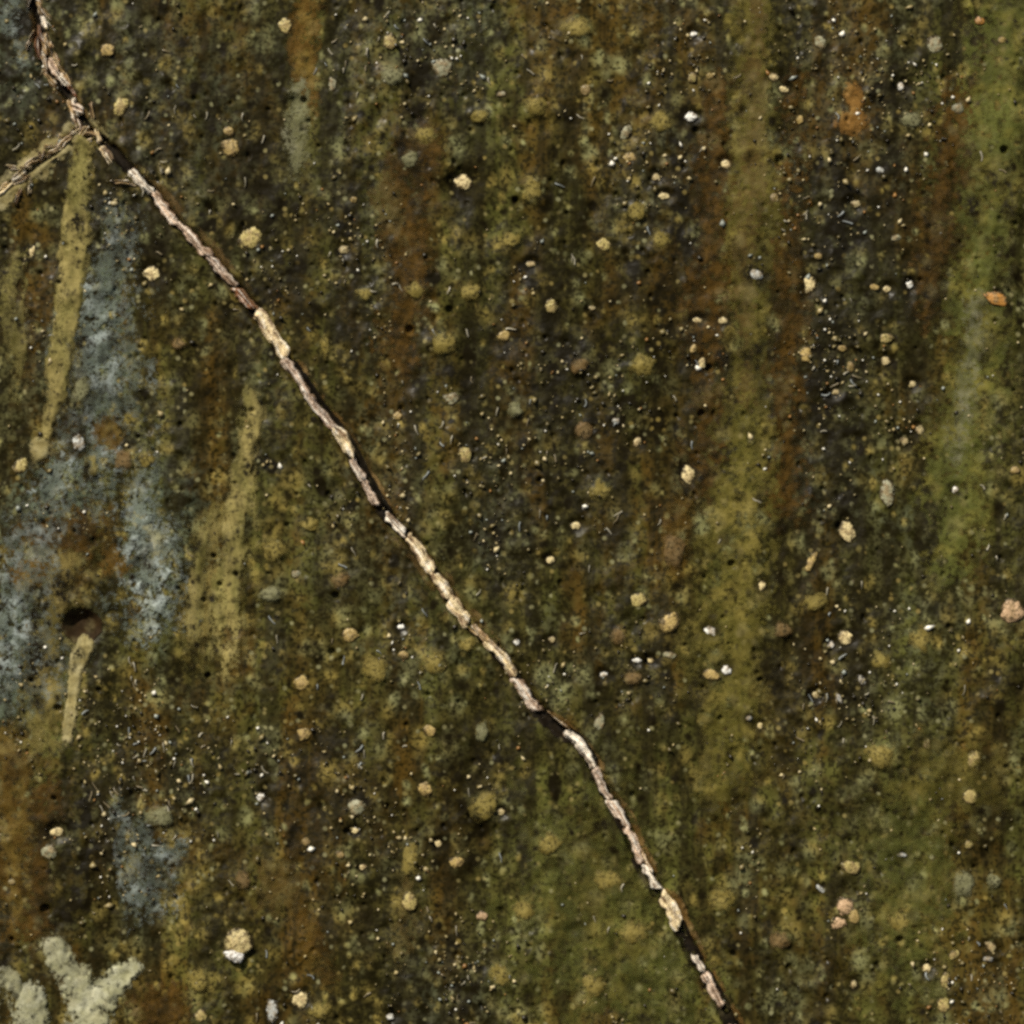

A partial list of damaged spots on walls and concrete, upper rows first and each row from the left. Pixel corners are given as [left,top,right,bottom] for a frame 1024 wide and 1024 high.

leakage [15,547,95,761]
leakage [29,135,97,464]
leakage [180,385,266,680]
crack [0,0,744,1024]
leakage [677,0,792,818]
leakage [910,0,1024,591]